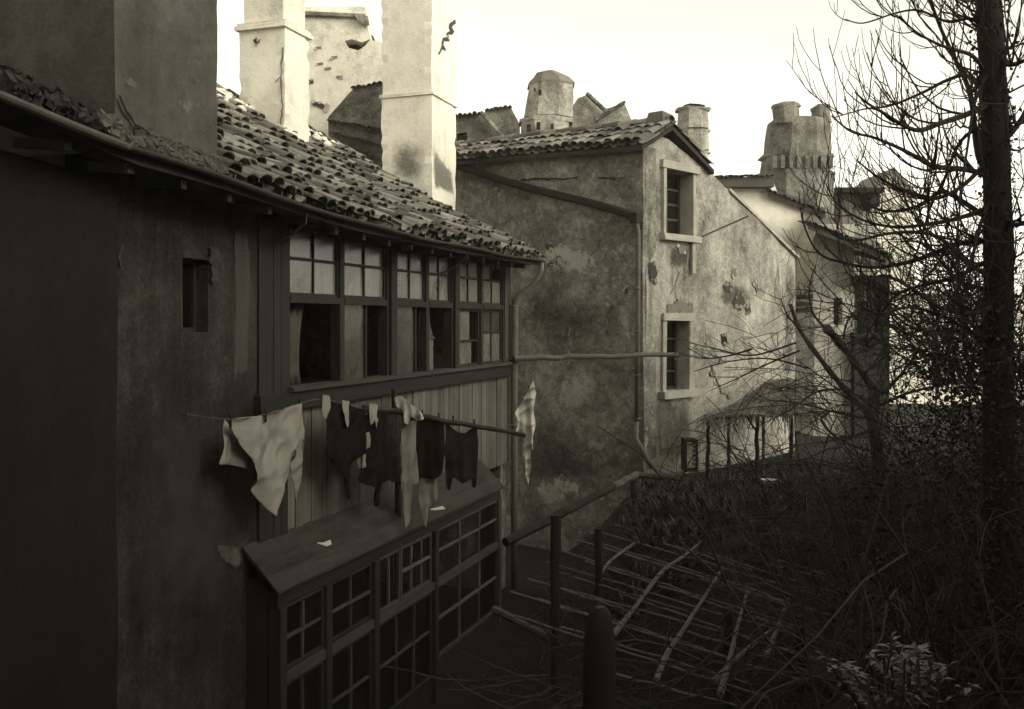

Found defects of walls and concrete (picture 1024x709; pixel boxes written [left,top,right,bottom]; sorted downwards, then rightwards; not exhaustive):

spalling [311,99,330,113]
spalling [723,268,761,315]